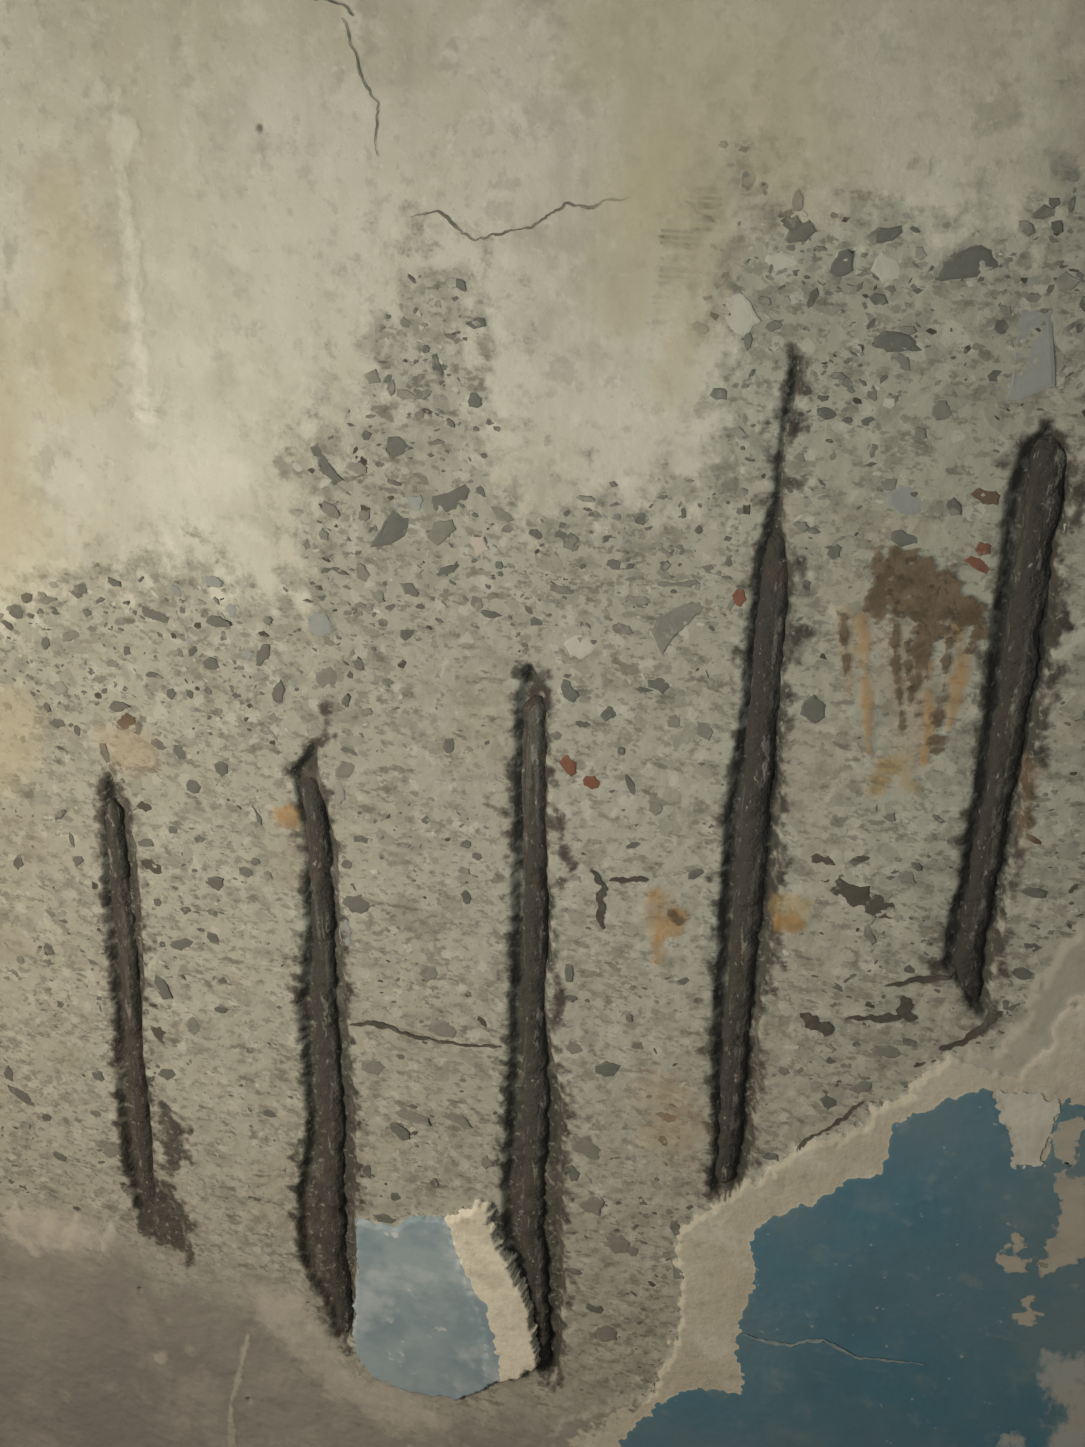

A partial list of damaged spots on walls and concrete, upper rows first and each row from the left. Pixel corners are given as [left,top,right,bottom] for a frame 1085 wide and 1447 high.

crack [315,0,379,157]
crack [413,197,629,241]
corrosion [837,546,990,756]
crack [349,1020,501,1049]